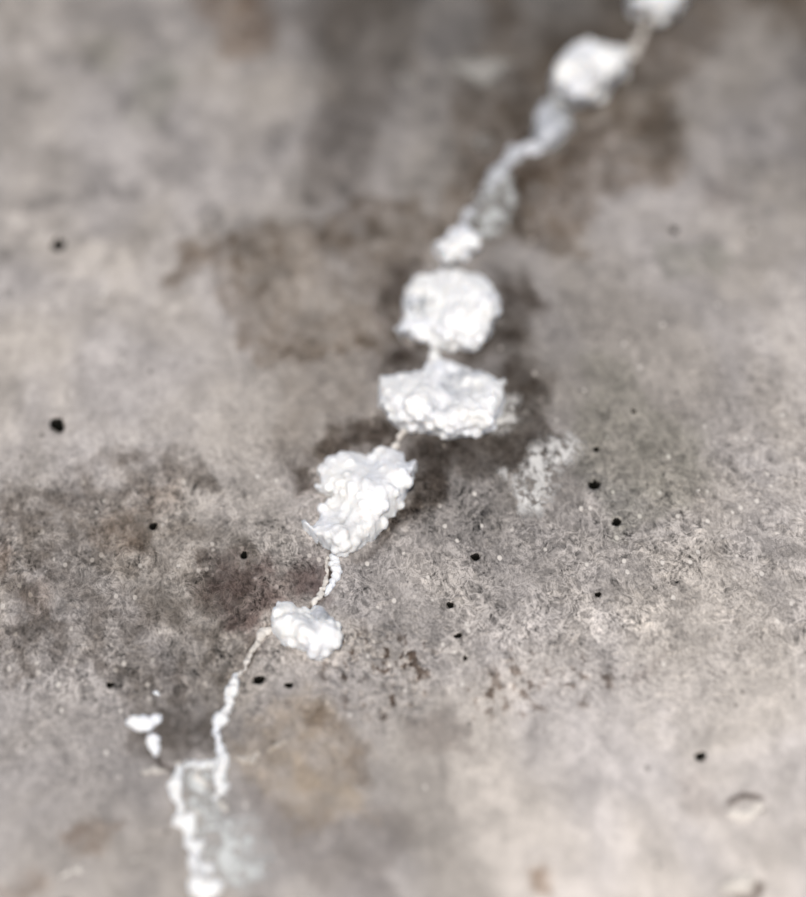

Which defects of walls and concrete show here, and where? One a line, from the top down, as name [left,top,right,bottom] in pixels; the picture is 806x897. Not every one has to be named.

crack [625,17,650,61]
efflorescence [629,0,686,25]
efflorescence [532,38,629,151]
crack [458,141,545,228]
damp [301,181,539,557]
crack [388,428,407,450]
damp [500,434,581,513]
crack [311,553,343,606]
efflorescence [271,601,343,661]
efflorescence [125,713,163,733]
crack [140,627,272,897]
efflorescence [186,771,263,886]